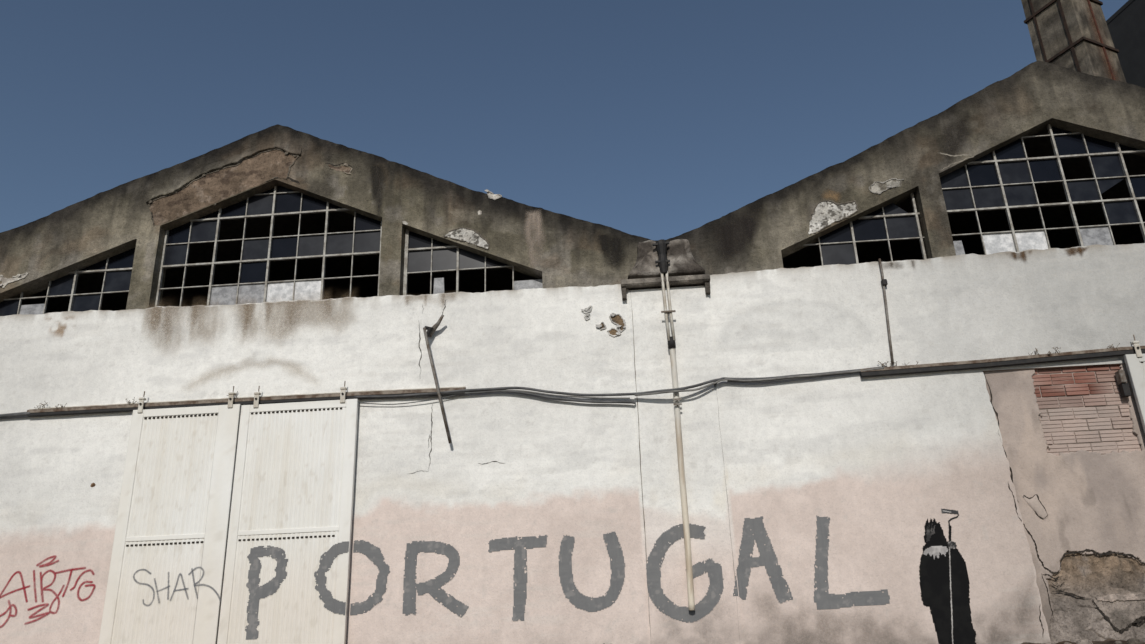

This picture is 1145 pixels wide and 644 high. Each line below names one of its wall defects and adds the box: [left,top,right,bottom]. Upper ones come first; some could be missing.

crack [146,140,352,221]
spalling [869,178,904,195]
spalling [443,227,490,250]
spalling [807,200,859,235]
peeling [0,273,29,288]
peeling [581,305,626,337]
flaking render [1032,364,1141,456]
crack [410,413,433,474]
crack [984,373,1145,633]
spalling [1046,551,1145,644]